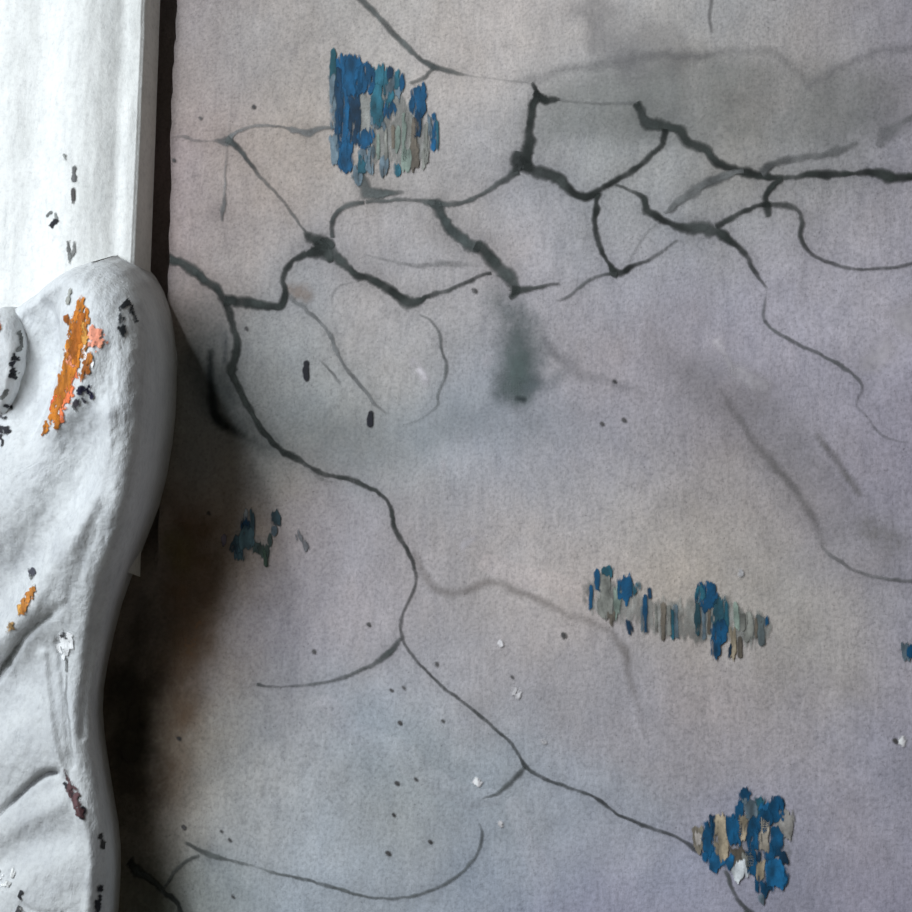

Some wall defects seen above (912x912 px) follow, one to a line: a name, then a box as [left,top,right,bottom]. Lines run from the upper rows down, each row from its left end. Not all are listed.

crack [359,0,458,83]
peeling [328,48,439,186]
crack [169,82,912,678]
peeling [221,509,281,567]
peeling [587,565,771,661]
peeling [901,642,912,661]
crack [418,662,697,852]
crack [275,872,378,898]
crack [406,834,482,898]
crack [724,870,752,912]
peeling [692,786,794,905]